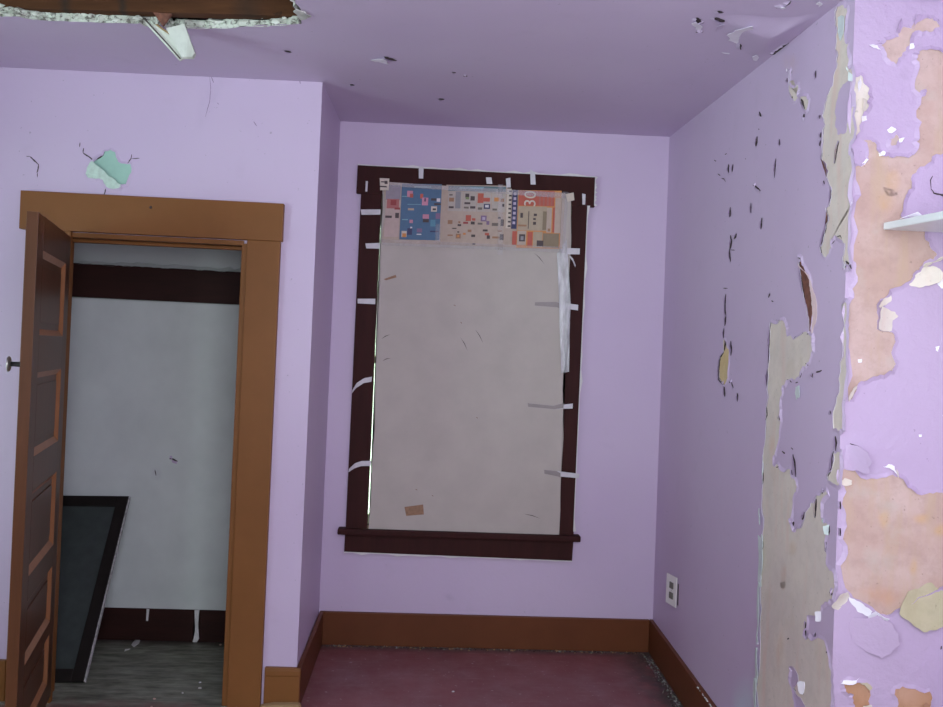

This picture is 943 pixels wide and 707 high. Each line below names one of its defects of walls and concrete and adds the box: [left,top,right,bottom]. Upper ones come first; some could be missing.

peeling [691,11,753,54]
crack [79,144,102,161]
peeling [820,1,943,435]
peeling [719,337,730,387]
peeling [753,316,943,707]